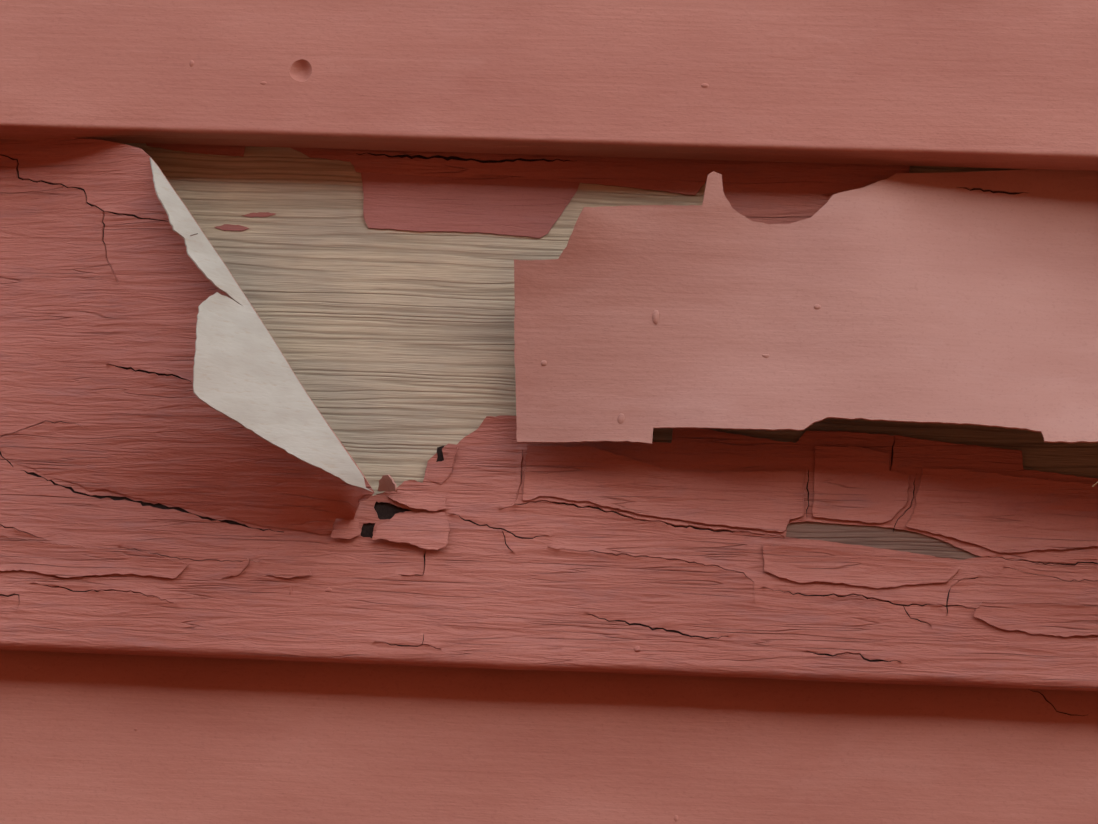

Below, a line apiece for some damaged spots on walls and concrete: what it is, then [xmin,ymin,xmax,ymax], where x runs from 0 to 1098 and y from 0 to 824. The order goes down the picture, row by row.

crack [1,155,168,264]
crack [110,364,191,382]
peeling [0,138,1098,554]
crack [517,455,750,533]
crack [459,516,540,552]
crack [768,556,1098,625]
crack [589,614,723,639]
crack [808,651,899,662]